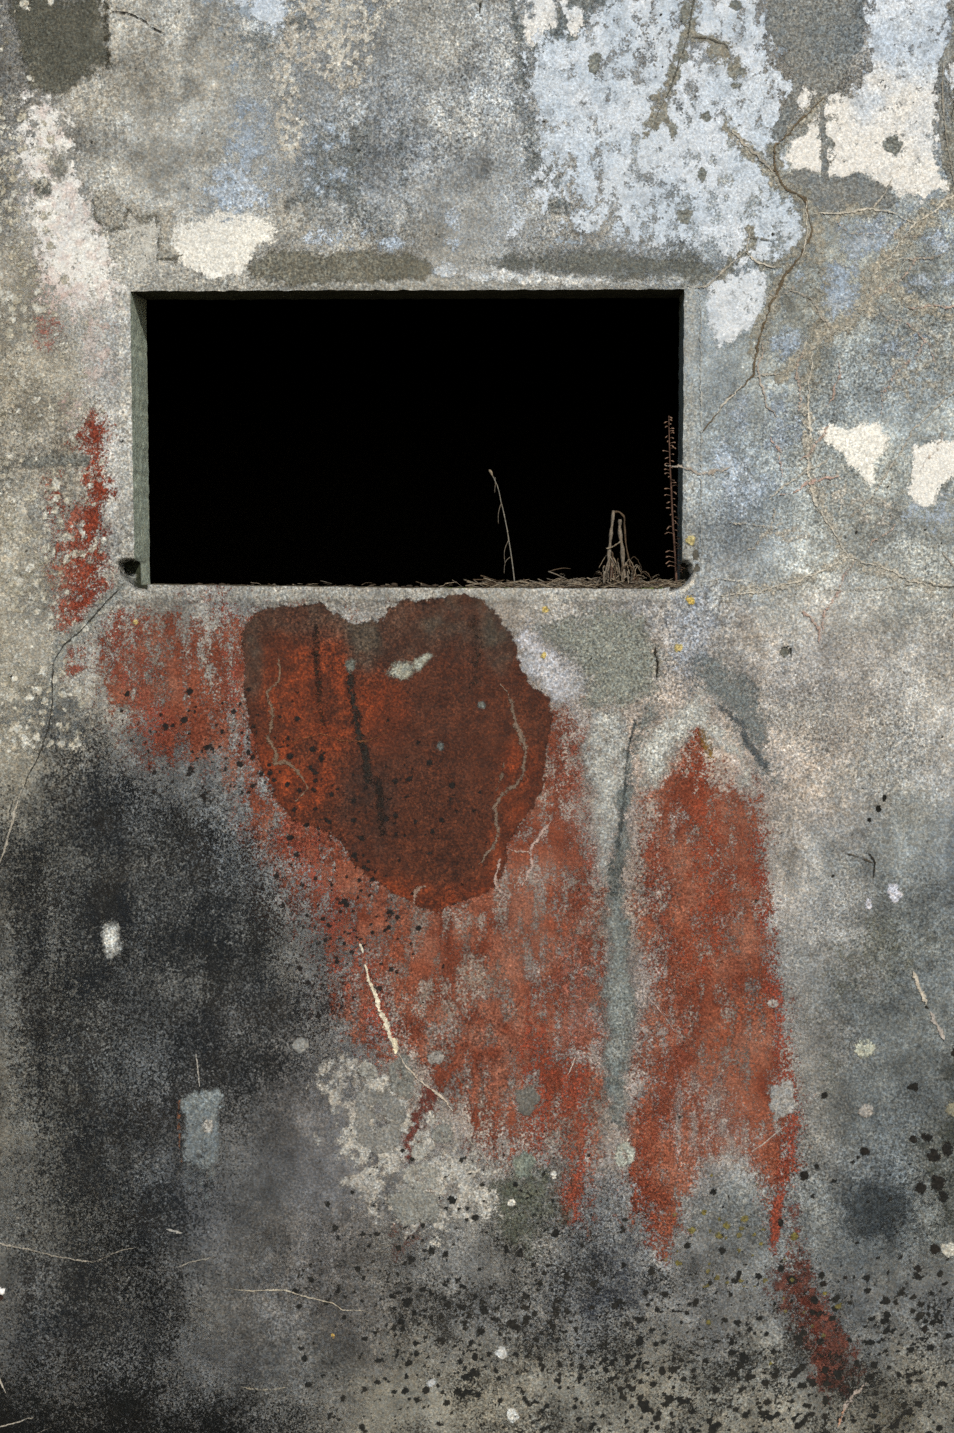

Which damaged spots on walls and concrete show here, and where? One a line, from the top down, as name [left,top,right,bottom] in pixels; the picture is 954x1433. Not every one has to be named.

crack [640,0,747,141]
peeling [493,0,954,356]
crack [665,464,730,475]
crack [686,56,954,682]
peeling [818,422,954,536]
rust [41,408,867,1405]
damp [0,586,954,1433]